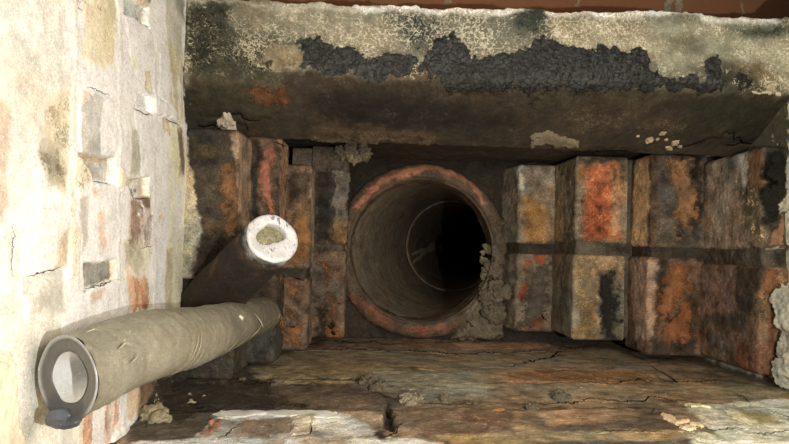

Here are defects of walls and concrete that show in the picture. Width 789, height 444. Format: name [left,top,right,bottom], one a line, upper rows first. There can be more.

damp [516,9,548,31]
rust [666,158,700,243]
damp [764,158,789,251]
rust [654,262,698,346]
crack [297,320,598,368]
crack [539,355,750,433]
crack [683,411,789,435]